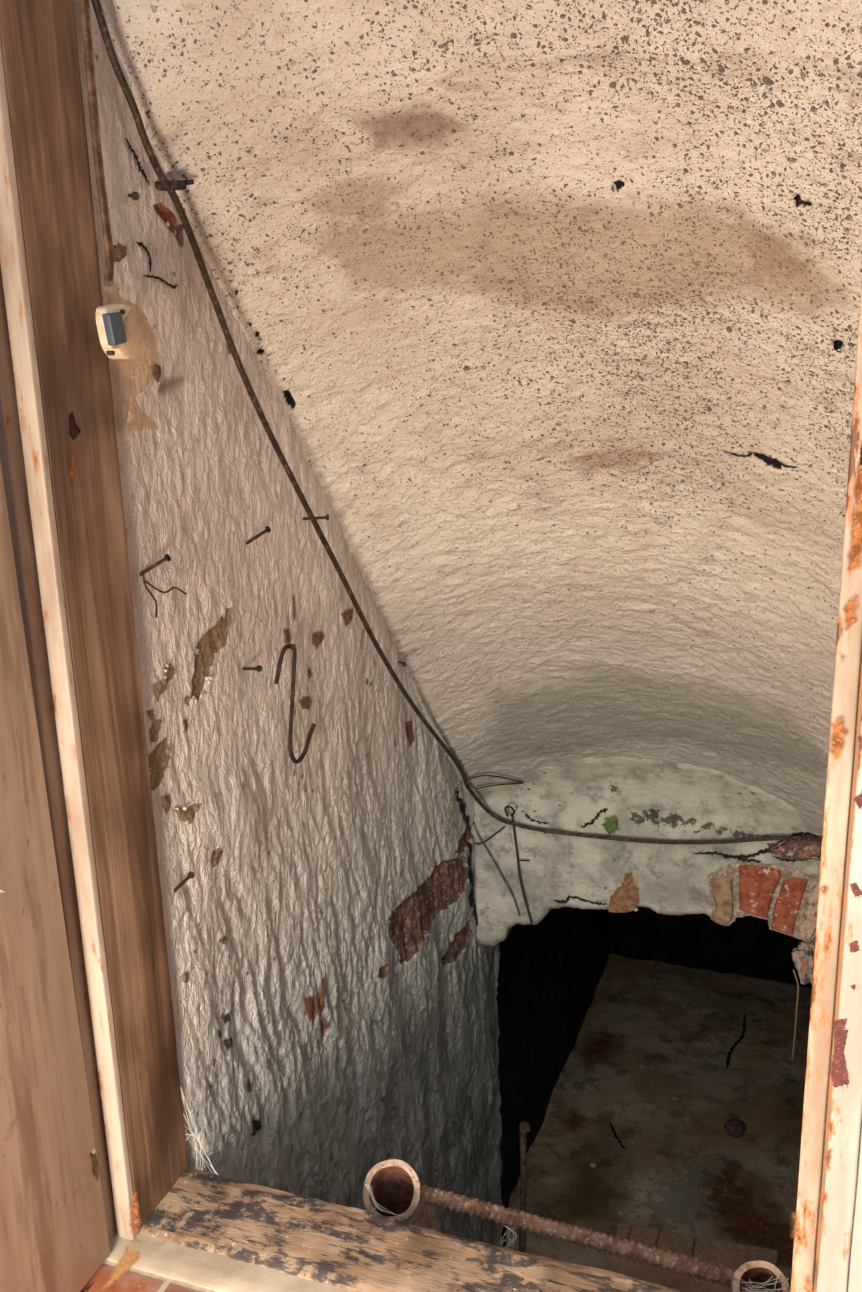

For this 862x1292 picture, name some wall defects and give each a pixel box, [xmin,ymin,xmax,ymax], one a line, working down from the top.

leakage [374,114,451,144]
peeling [151,363,161,385]
corrosion [848,443,862,570]
corrosion [844,597,856,628]
flaking render [183,608,232,733]
flaking render [147,663,202,825]
corrosion [831,718,847,757]
flaking render [379,823,474,978]
flaking render [707,837,822,943]
leakage [557,1141,743,1237]
corrosion [697,1165,826,1266]